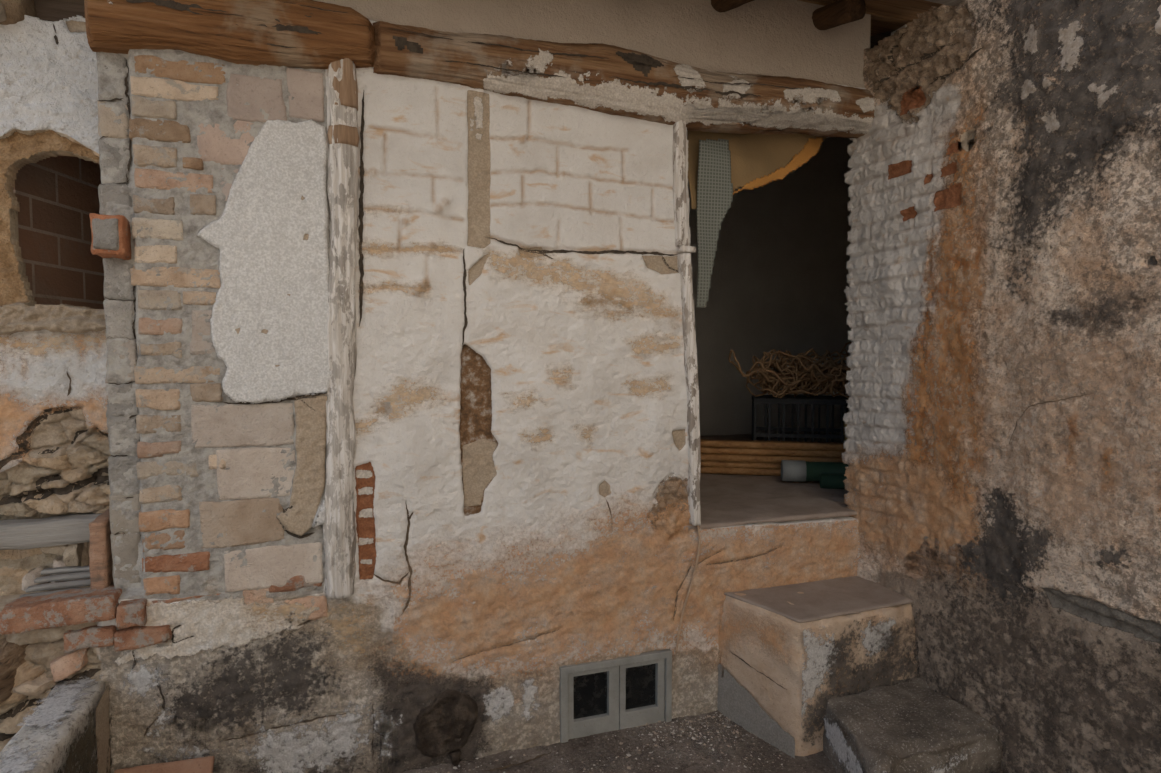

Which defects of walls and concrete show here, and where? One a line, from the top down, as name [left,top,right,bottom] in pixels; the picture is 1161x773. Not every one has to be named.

flaking render [0,130,99,307]
damp [362,244,452,254]
crack [462,237,678,347]
damp [491,253,676,317]
peeling [467,4,978,285]
damp [975,0,1161,304]
flaking render [29,409,88,458]
flaking render [459,344,498,492]
flaking render [464,478,493,516]
damp [124,291,1161,773]